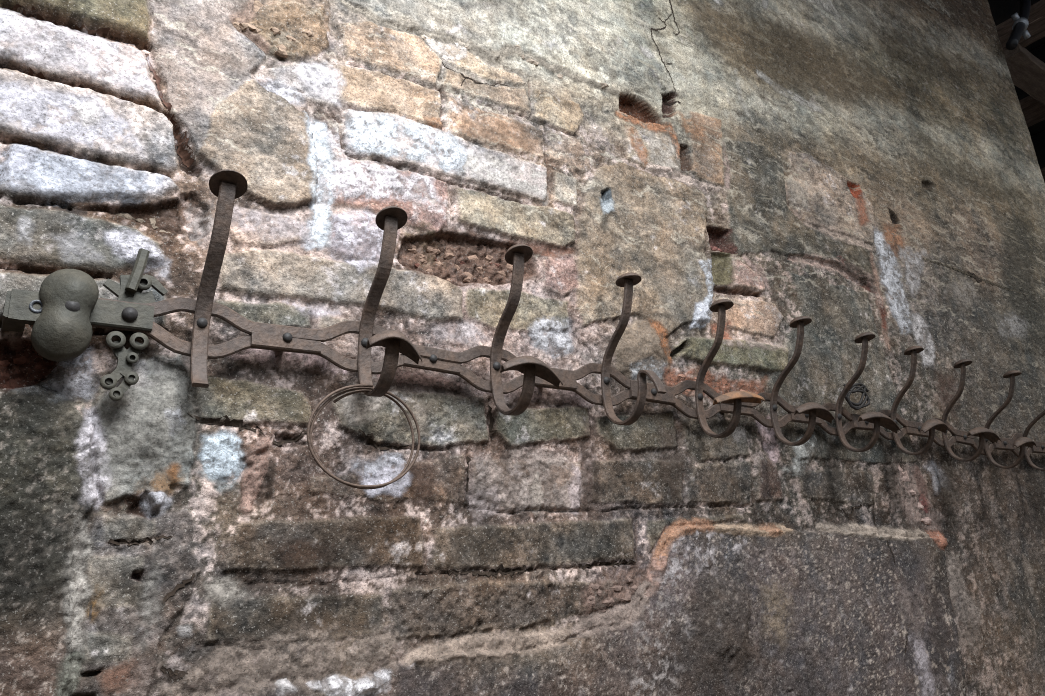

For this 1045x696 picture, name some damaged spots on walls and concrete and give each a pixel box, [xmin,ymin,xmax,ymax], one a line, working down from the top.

crack [651,0,681,106]
spalling [398,230,534,286]
leakage [789,198,935,365]